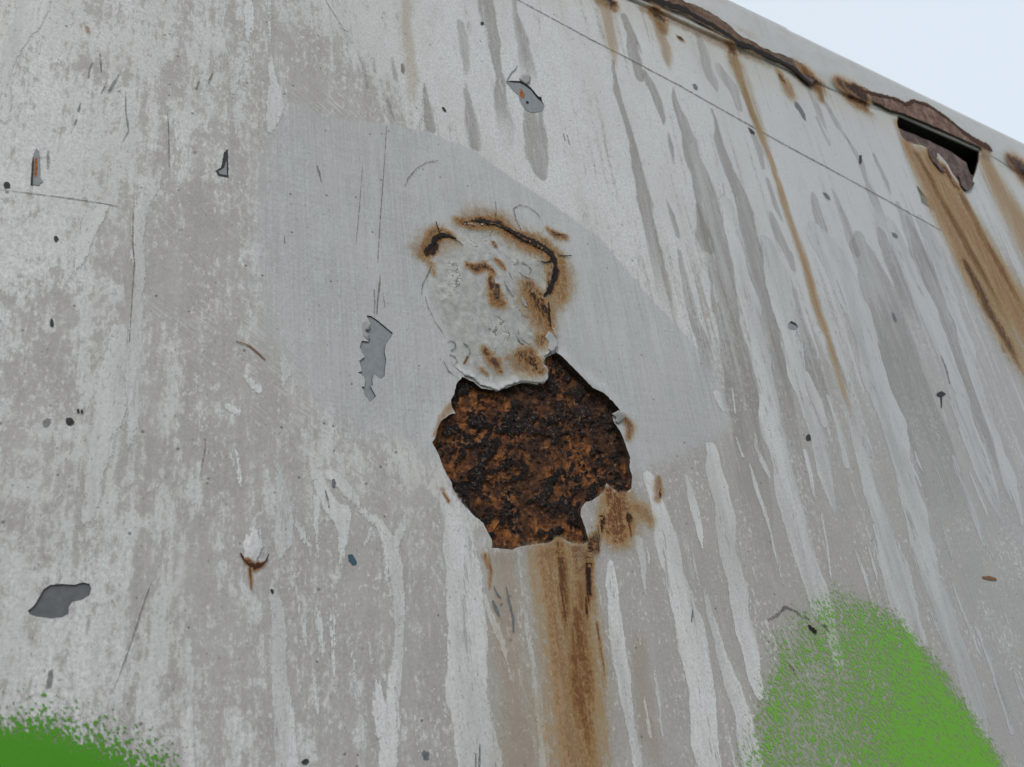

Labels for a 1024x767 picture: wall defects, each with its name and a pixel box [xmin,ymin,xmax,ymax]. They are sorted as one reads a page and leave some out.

peeling [216,149,229,177]
peeling [358,315,393,402]
peeling [506,65,545,112]
corrosion [725,40,847,399]
corrosion [776,61,872,113]
water stain [719,196,1024,746]
corrosion [895,119,1024,375]
peeling [28,582,91,619]
water stain [439,487,551,767]
corrosion [528,475,664,767]
water stain [605,558,664,767]
water stain [634,442,765,767]